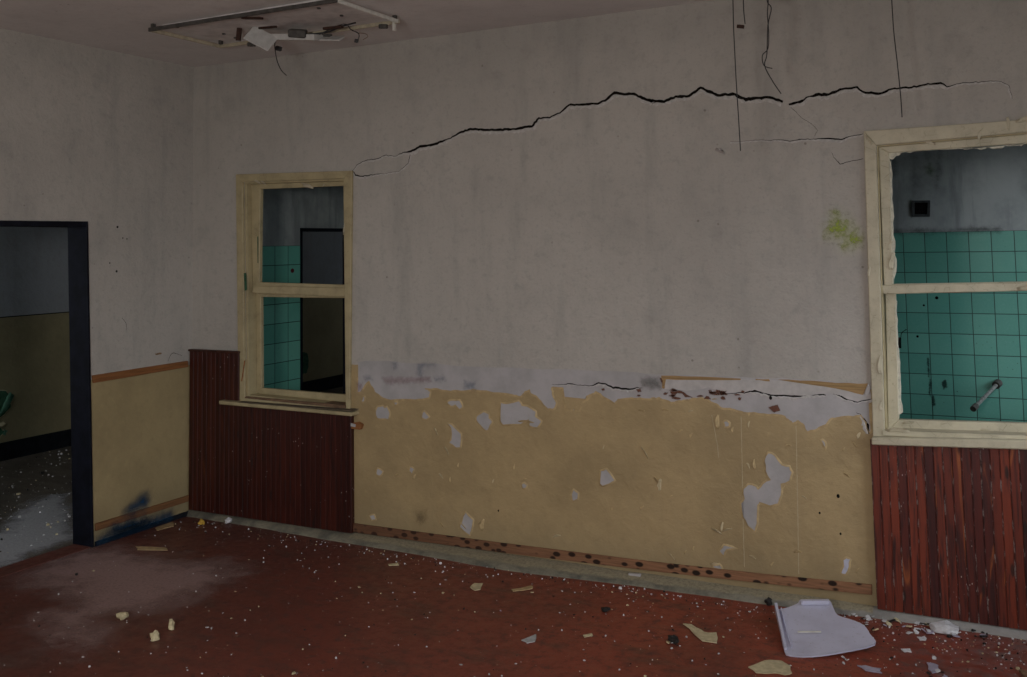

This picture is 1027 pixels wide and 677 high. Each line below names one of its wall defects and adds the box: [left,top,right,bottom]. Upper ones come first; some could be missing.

crack [352,81,1012,179]
crack [553,382,642,393]
peeling [357,361,873,451]
peeling [459,511,485,536]
peeling [599,468,616,487]
peeling [740,451,794,533]